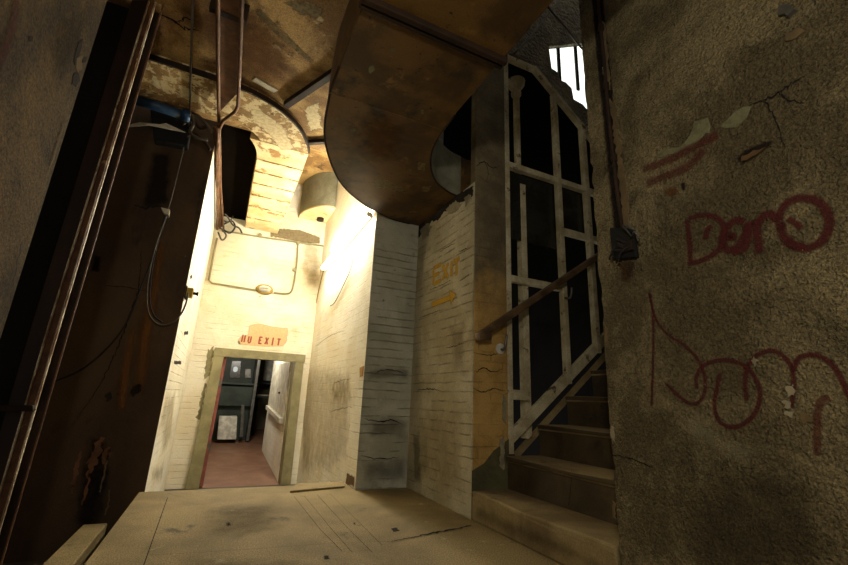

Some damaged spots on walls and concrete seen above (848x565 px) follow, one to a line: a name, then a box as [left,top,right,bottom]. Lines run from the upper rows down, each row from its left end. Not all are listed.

peeling [251,109,293,150]
peeling [655,117,711,158]
peeling [721,106,751,129]
crack [749,76,804,150]
peeling [195,346,214,420]
crack [447,343,504,392]
flaking render [782,384,815,425]
crack [395,525,472,541]